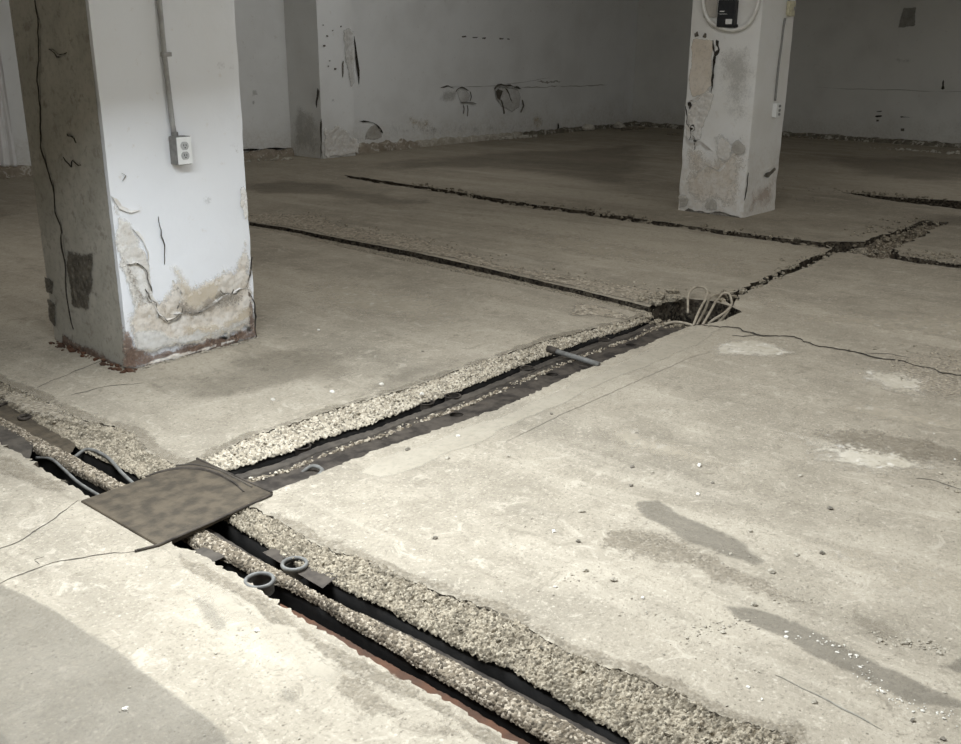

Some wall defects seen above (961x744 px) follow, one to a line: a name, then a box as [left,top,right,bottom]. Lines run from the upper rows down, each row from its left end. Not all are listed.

peeling [686,32,713,145]
crack [34,0,74,329]
flaking render [9,0,253,367]
rust [62,292,256,368]
crack [693,324,961,393]